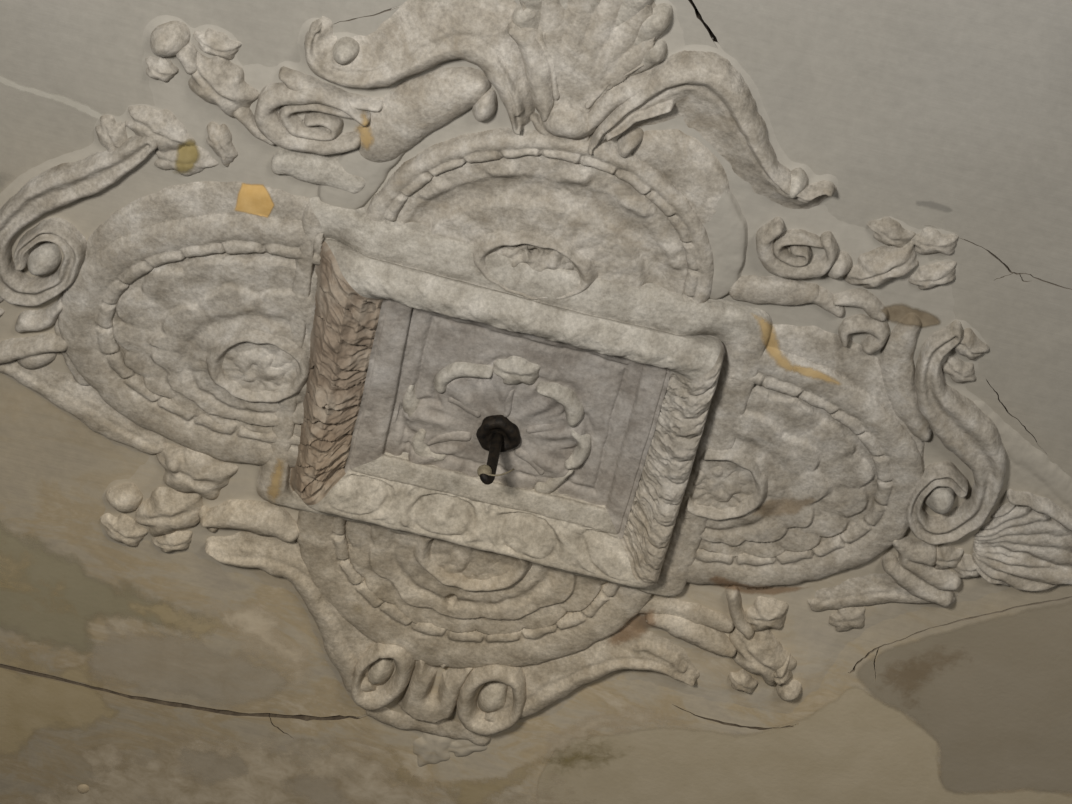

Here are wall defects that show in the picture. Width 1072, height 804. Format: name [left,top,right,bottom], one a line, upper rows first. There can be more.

crack [688,0,718,45]
crack [925,225,1072,290]
crack [848,596,1072,680]
crack [0,664,368,737]
peeling [537,687,1072,804]